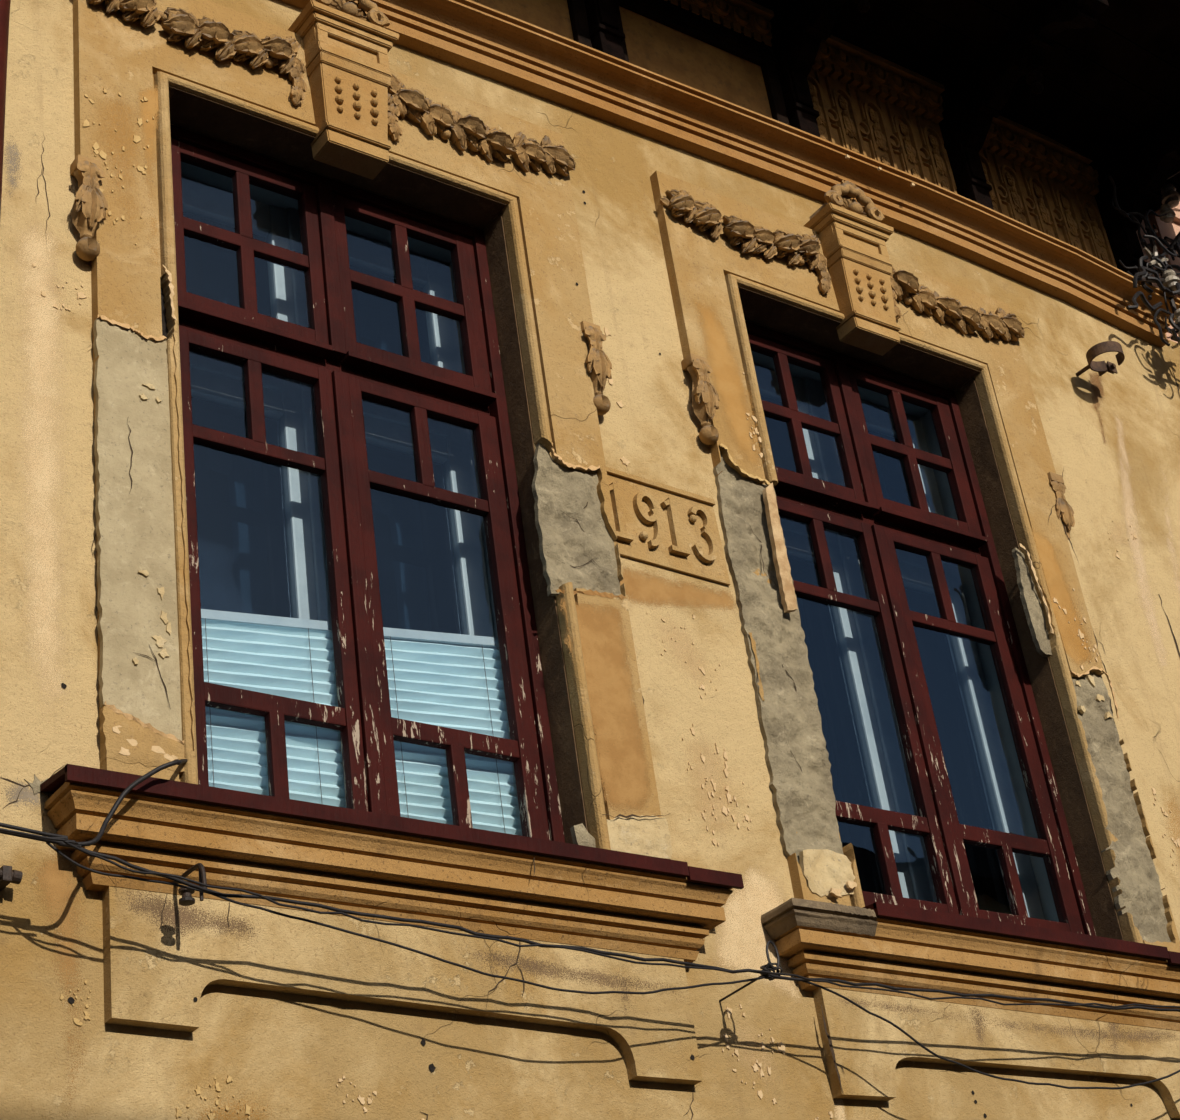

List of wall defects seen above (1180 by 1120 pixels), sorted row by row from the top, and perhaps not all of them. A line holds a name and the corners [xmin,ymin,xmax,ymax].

crack [36,133,50,244]
peeling [82,88,154,228]
flaking render [5,216,185,775]
flaking render [532,443,626,600]
flaking render [713,372,857,898]
crack [1159,595,1180,657]
flaking render [1012,543,1171,943]
peeling [175,1074,278,1120]
peeling [720,1004,785,1105]